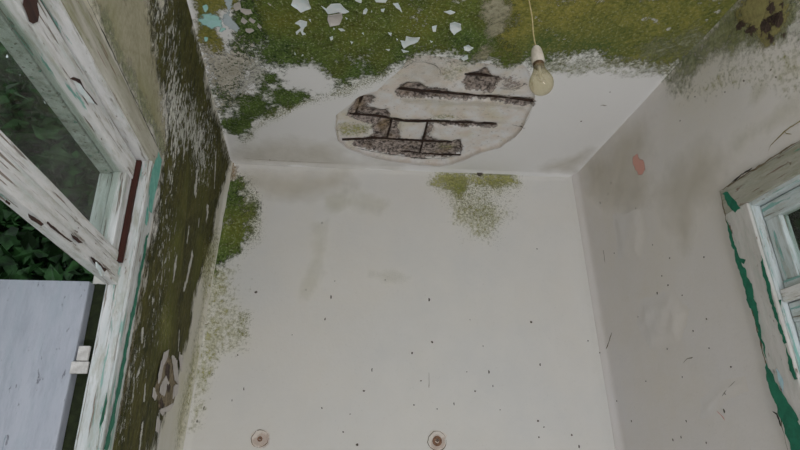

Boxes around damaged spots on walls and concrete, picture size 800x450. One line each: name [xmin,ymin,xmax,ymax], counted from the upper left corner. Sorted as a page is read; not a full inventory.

peeling [291,0,311,35]
peeling [322,3,349,40]
peeling [355,0,402,14]
peeling [444,10,461,35]
damp [228,0,760,94]
spalling [335,32,536,167]
flaking render [94,0,272,450]
damp [101,0,313,450]
damp [431,172,519,234]